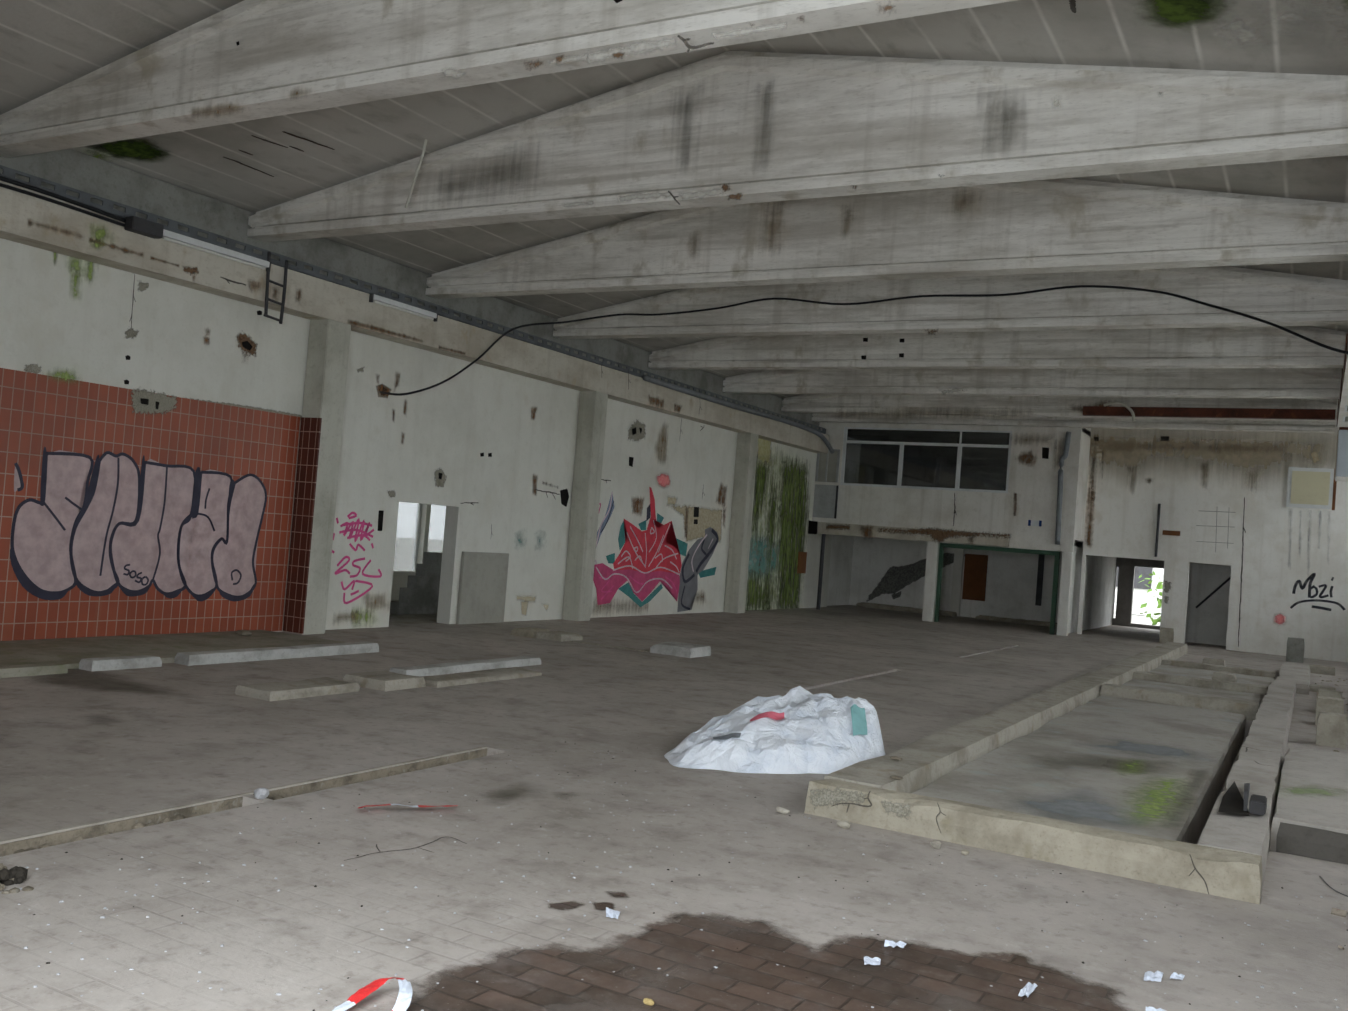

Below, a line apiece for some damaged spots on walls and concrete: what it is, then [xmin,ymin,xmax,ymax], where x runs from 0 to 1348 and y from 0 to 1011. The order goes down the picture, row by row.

flaking render [237,333,258,357]
damp [746,438,808,611]
damp [550,891,628,910]
damp [406,913,1127,1011]